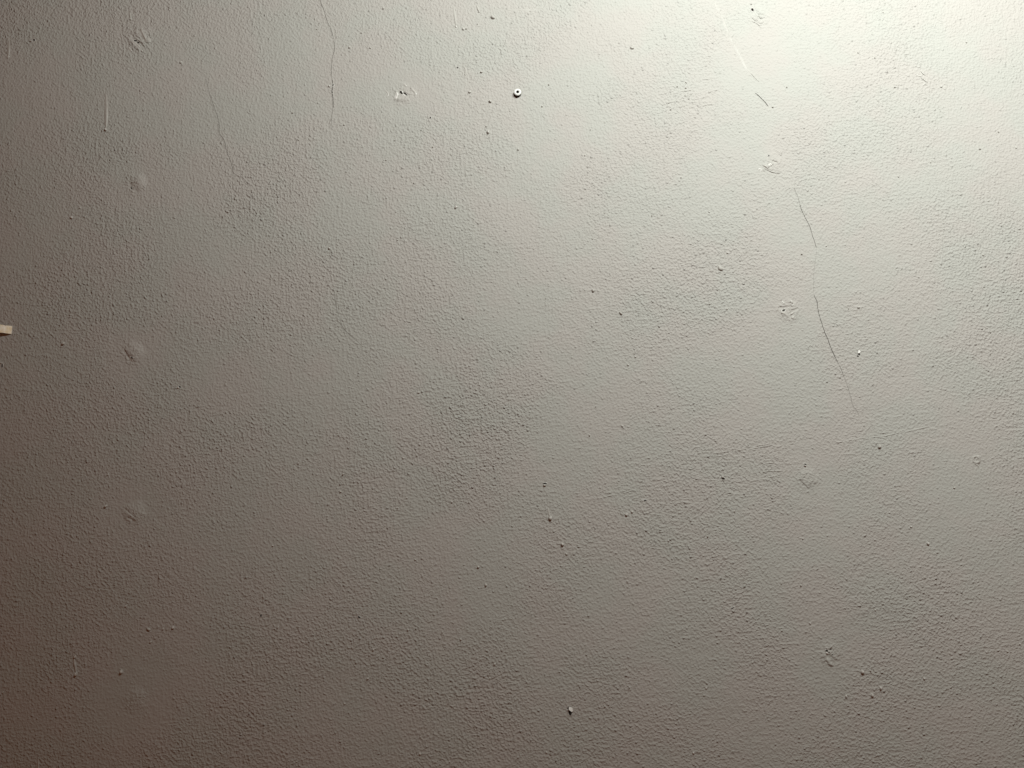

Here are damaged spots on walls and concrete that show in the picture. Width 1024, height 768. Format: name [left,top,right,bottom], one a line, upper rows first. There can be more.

crack [319,0,336,129]
crack [793,188,859,416]